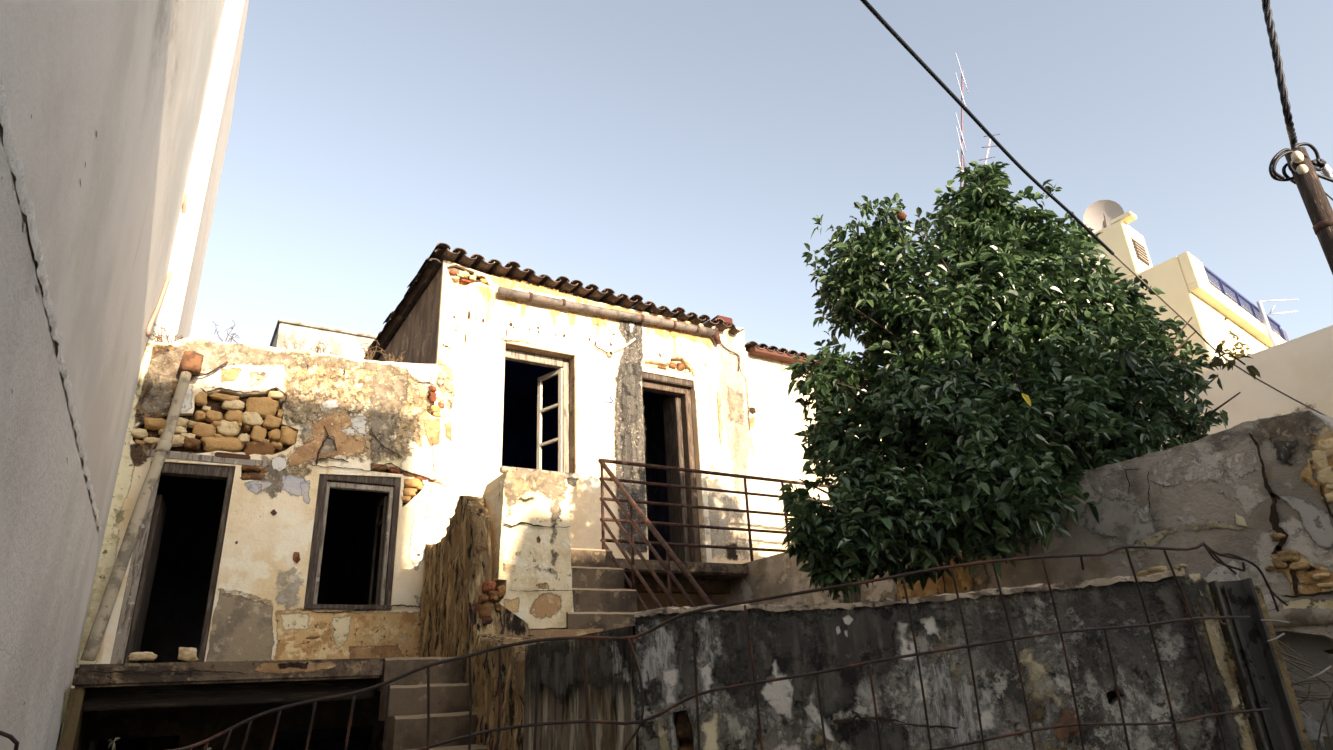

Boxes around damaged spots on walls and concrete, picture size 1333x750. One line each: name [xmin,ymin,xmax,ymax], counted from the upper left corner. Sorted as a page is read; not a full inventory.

peeling [129,443,158,466]
peeling [135,343,455,516]
peeling [219,552,422,674]
peeling [409,495,444,570]
water stain [614,319,648,556]
water stain [701,342,752,560]
water stain [526,595,949,750]
crack [1249,433,1333,598]
peeling [1272,550,1333,595]
peeling [1280,426,1333,550]